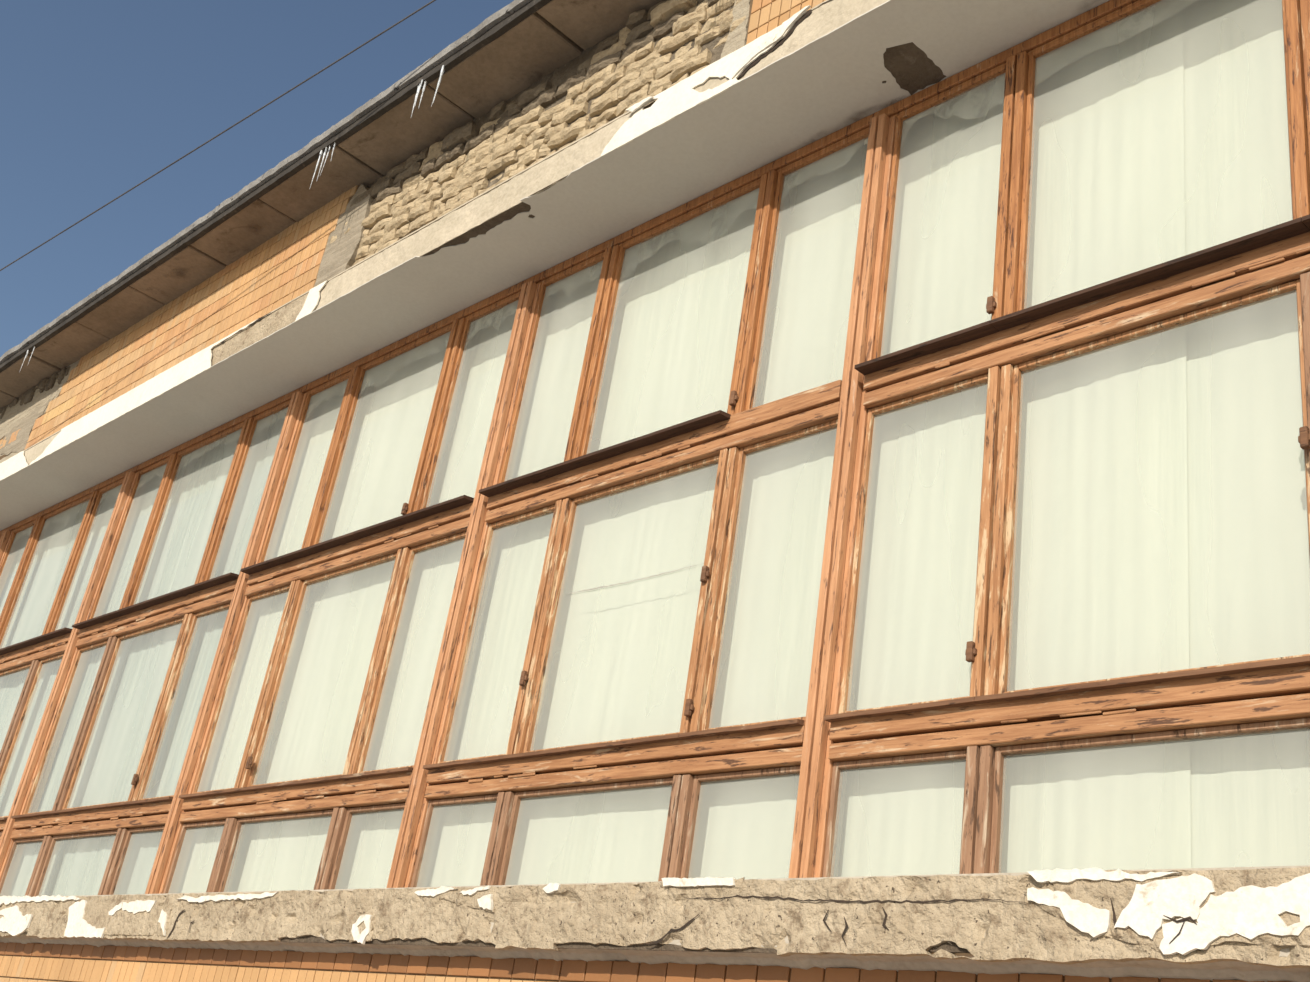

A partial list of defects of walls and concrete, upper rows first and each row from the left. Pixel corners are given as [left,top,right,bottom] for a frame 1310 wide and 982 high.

spalling [882,42,946,95]
peeling [212,0,888,366]
peeling [0,360,80,465]
peeling [0,891,279,938]
crack [644,895,1030,946]
peeling [1023,867,1310,955]